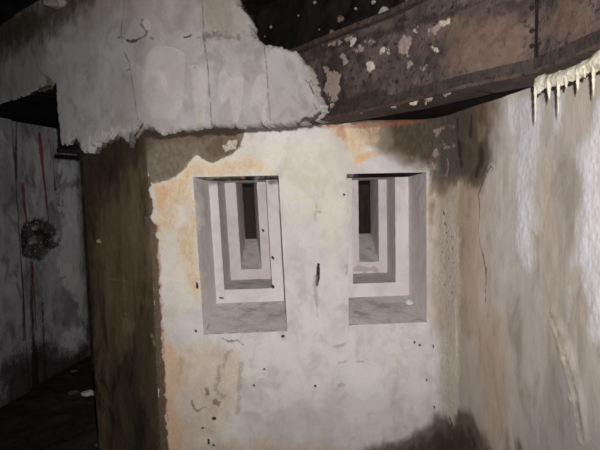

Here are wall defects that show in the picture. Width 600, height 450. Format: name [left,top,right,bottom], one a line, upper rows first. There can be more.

peeling [21,138,91,353]
rust [321,51,349,109]
damp [508,50,600,269]